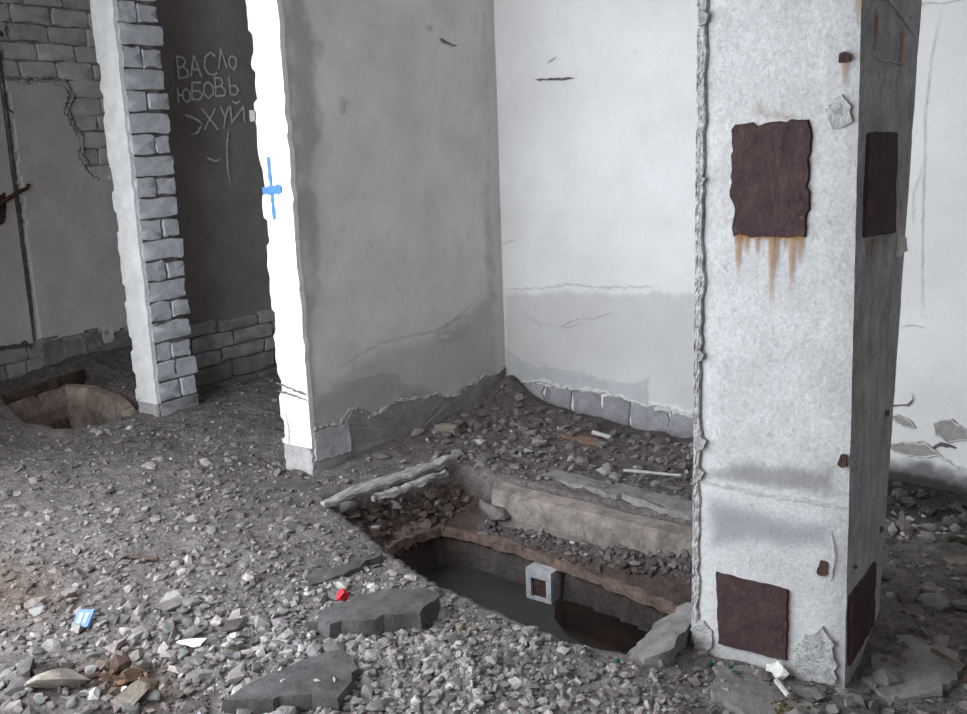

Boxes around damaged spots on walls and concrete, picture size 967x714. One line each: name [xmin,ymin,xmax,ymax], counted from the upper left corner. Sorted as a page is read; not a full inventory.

flaking render [4,76,90,167]
corrosion [735,234,803,294]
spalling [312,366,508,475]
spalling [885,410,916,428]
spalling [891,419,967,471]